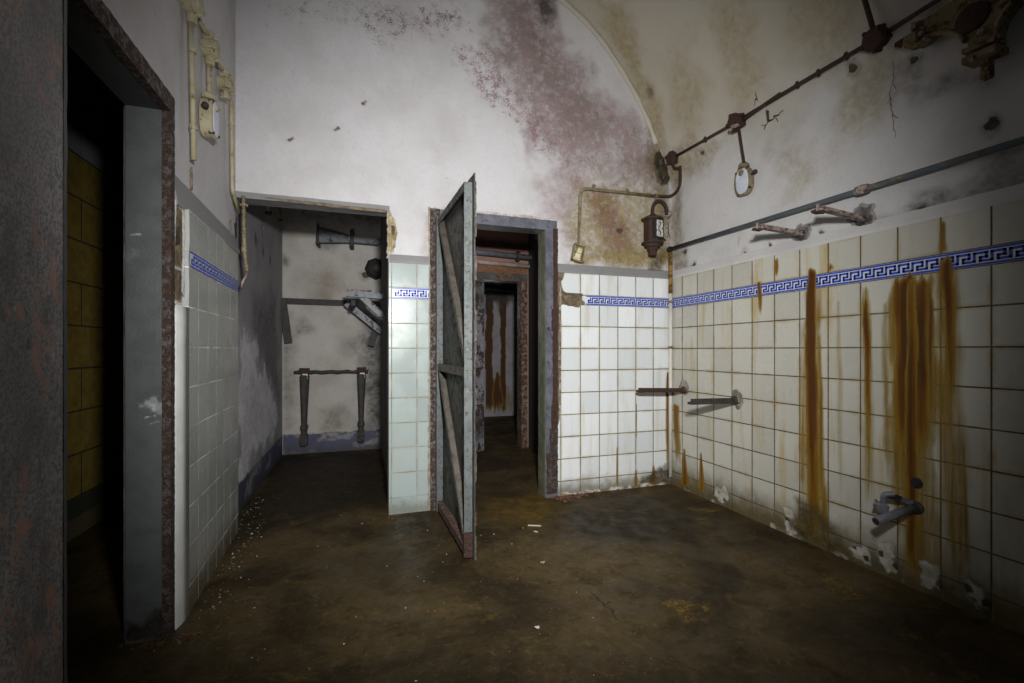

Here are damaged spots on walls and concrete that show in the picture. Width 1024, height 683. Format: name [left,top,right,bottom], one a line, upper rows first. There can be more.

leakage [458,0,683,270]
crack [754,92,783,129]
crack [887,62,898,136]
flaking render [269,198,398,258]
rust [485,292,506,413]
spalling [558,273,585,422]
rust [666,372,705,492]
rust [801,268,827,538]
rust [861,289,871,488]
rust [884,221,968,583]